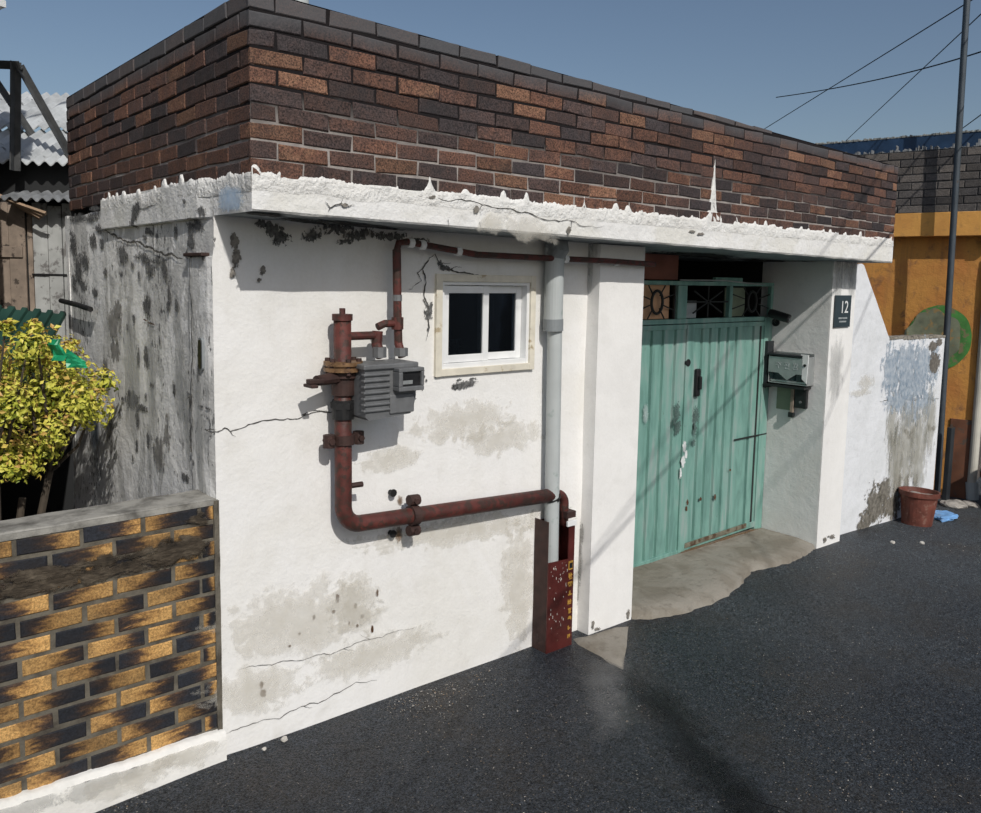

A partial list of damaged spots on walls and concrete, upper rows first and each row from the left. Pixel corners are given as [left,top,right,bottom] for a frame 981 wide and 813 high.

peeling [254,219,430,247]
crack [414,254,478,340]
crack [101,228,332,474]
peeling [881,335,943,438]
damp [90,413,99,459]
peeling [673,401,700,478]
spalling [0,511,210,604]
crack [232,680,372,731]